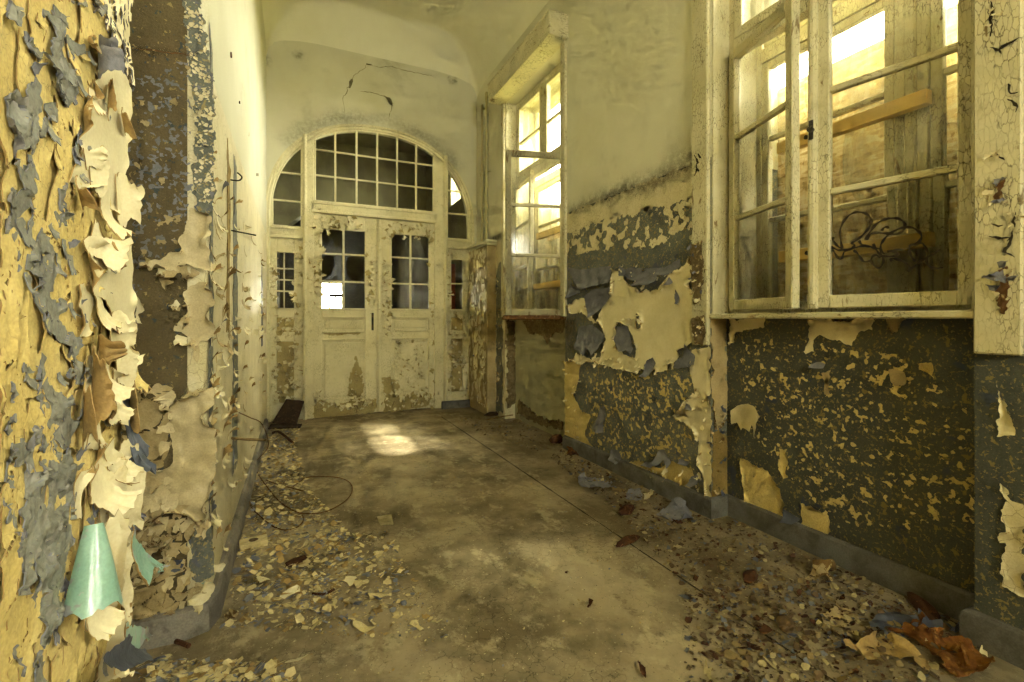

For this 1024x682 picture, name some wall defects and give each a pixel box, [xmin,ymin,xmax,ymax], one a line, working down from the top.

crack [985,1,1019,53]
crack [343,63,426,120]
crack [1007,83,1018,112]
crack [983,149,1005,161]
crack [989,212,1024,257]
peeling [0,0,364,682]
peeling [302,162,975,534]
peeling [996,386,1016,437]
peeling [997,483,1024,597]